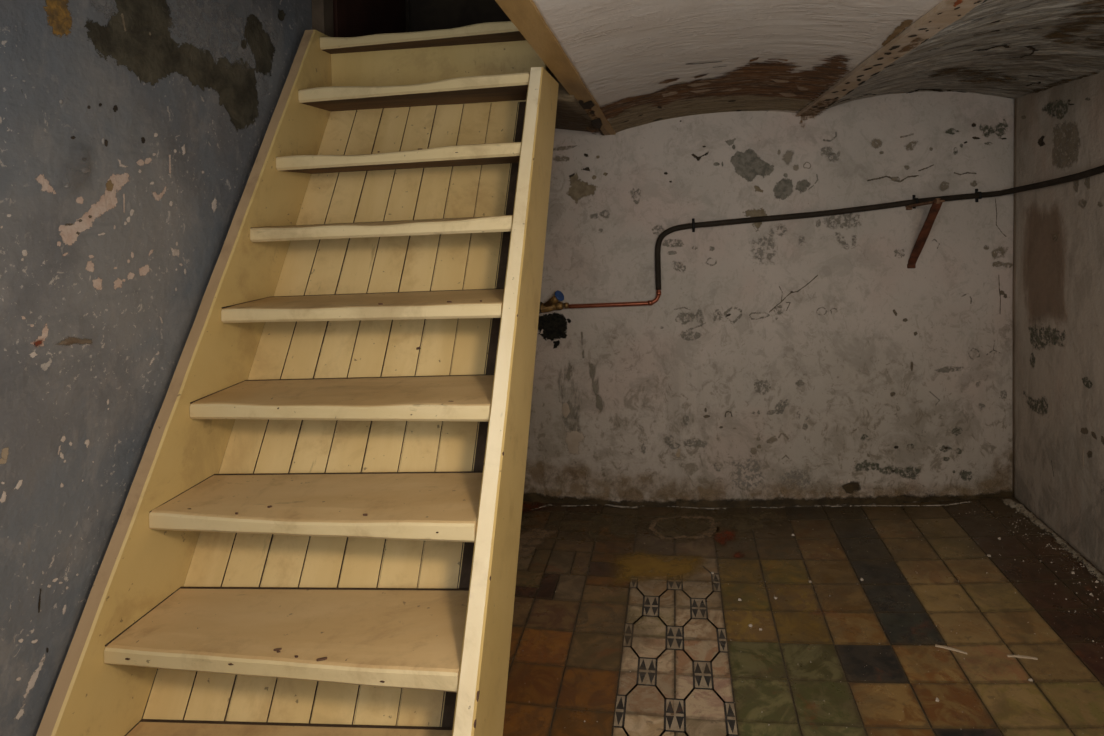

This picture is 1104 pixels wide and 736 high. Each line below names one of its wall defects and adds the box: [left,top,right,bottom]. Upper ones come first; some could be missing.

peeling [579,55,851,135]
peeling [57,153,156,256]
flaking render [566,153,608,204]
flaking render [691,138,818,200]
spalling [538,312,571,349]
leakage [523,428,1012,509]